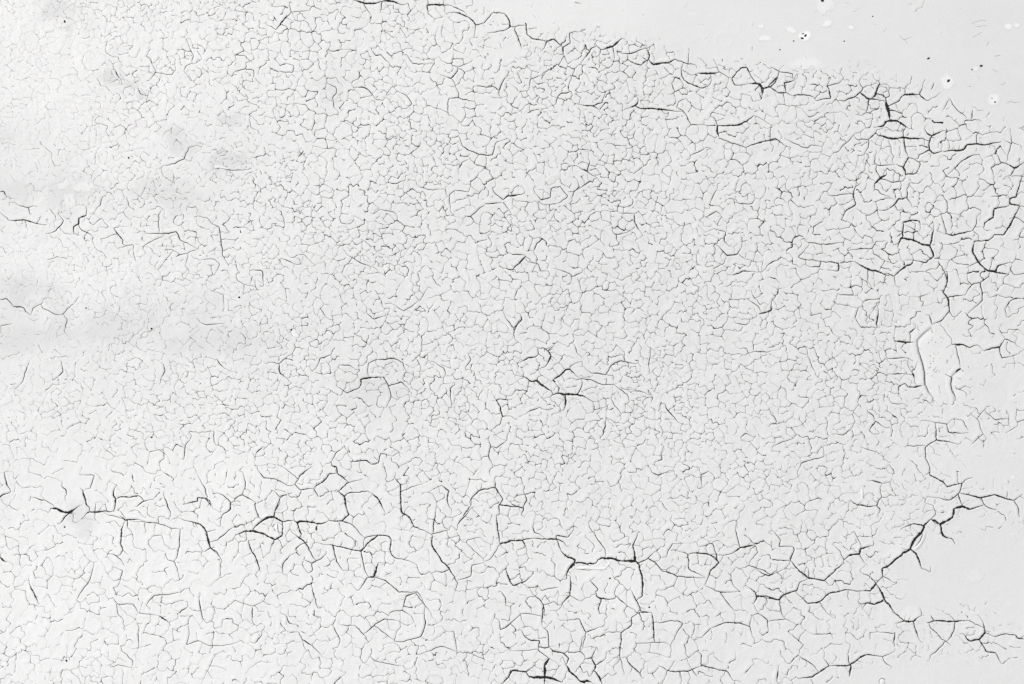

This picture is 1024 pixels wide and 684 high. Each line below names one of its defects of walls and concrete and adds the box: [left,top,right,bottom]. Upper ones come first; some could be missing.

crack [355,0,576,53]
crack [445,63,540,110]
crack [0,191,87,233]
crack [419,186,568,216]
crack [597,38,1024,363]
crack [110,225,263,291]
crack [512,254,580,280]
crack [0,317,1021,684]